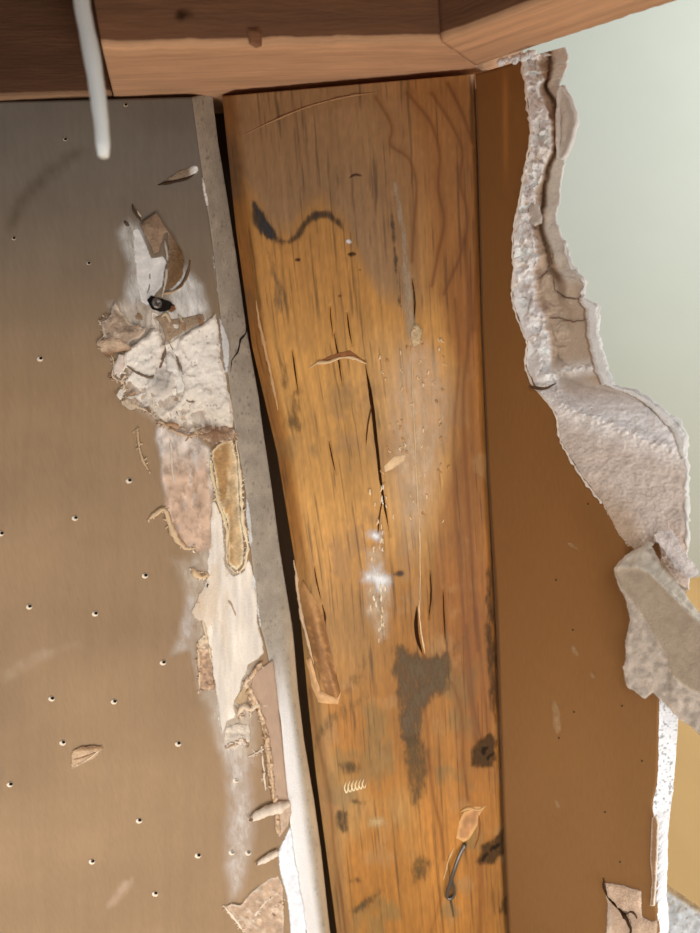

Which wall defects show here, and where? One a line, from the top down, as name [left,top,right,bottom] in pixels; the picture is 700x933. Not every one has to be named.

water stain [253,202,281,242]
water stain [292,211,341,241]
spalling [96,303,234,441]
crack [330,309,390,540]
spalling [510,47,699,590]
spalling [191,502,264,733]
spalling [300,580,341,704]
water stain [393,647,450,802]
peeling [249,800,291,822]
spalling [650,699,678,933]
crack [602,879,637,933]